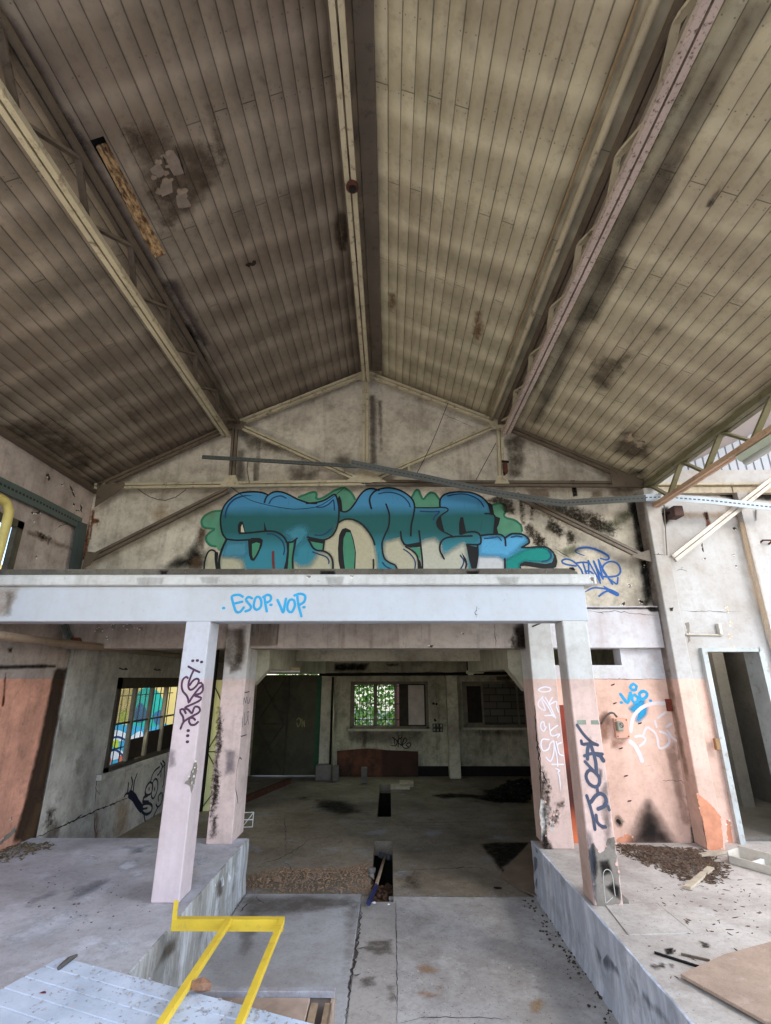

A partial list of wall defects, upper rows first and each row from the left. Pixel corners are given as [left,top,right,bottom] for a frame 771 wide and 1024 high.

peeling [150,150,191,208]
water stain [134,132,212,222]
water stain [489,496,640,555]
water stain [641,547,659,612]
water stain [210,707,222,836]
peeling [539,799,562,840]
peeling [696,793,733,850]
crack [345,896,507,1023]